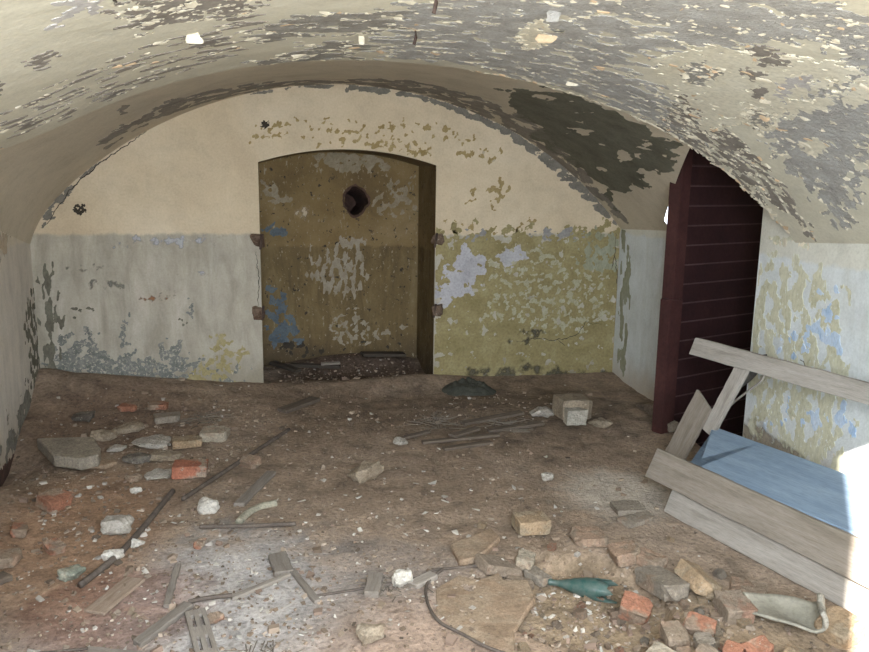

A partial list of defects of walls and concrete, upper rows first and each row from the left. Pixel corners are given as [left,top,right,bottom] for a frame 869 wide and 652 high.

peeling [0,0,869,382]
flaking render [0,454,14,487]
peeling [747,374,860,479]